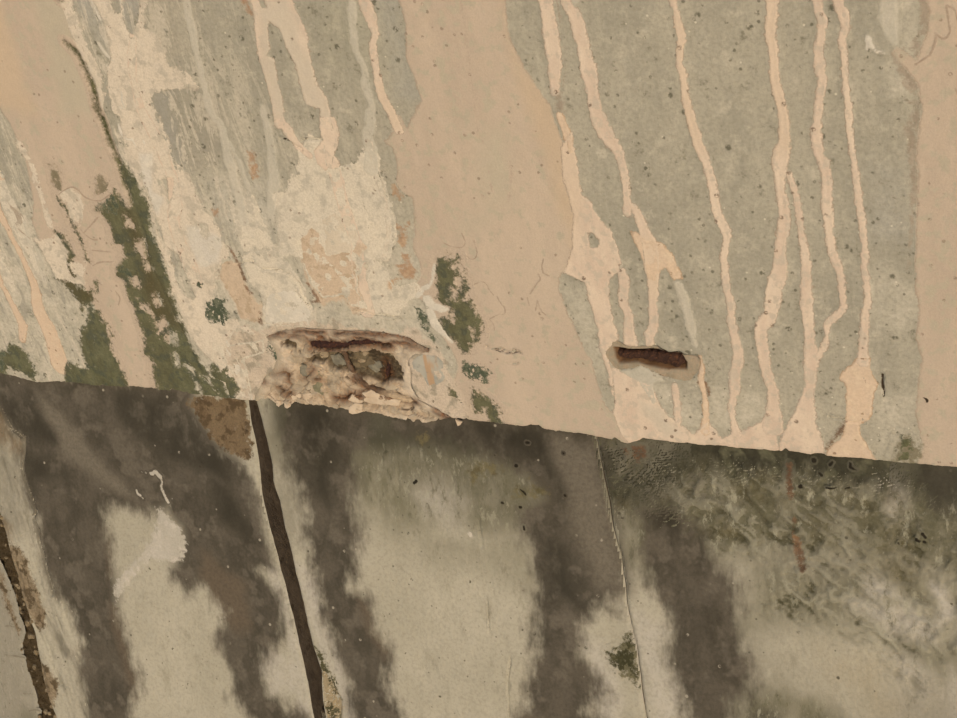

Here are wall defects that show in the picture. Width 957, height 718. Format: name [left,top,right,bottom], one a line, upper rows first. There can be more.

spalling [255,327,463,426]
rust [310,338,413,403]
rust [618,348,716,400]
leakage [365,411,390,424]
efflorescence [107,468,193,608]